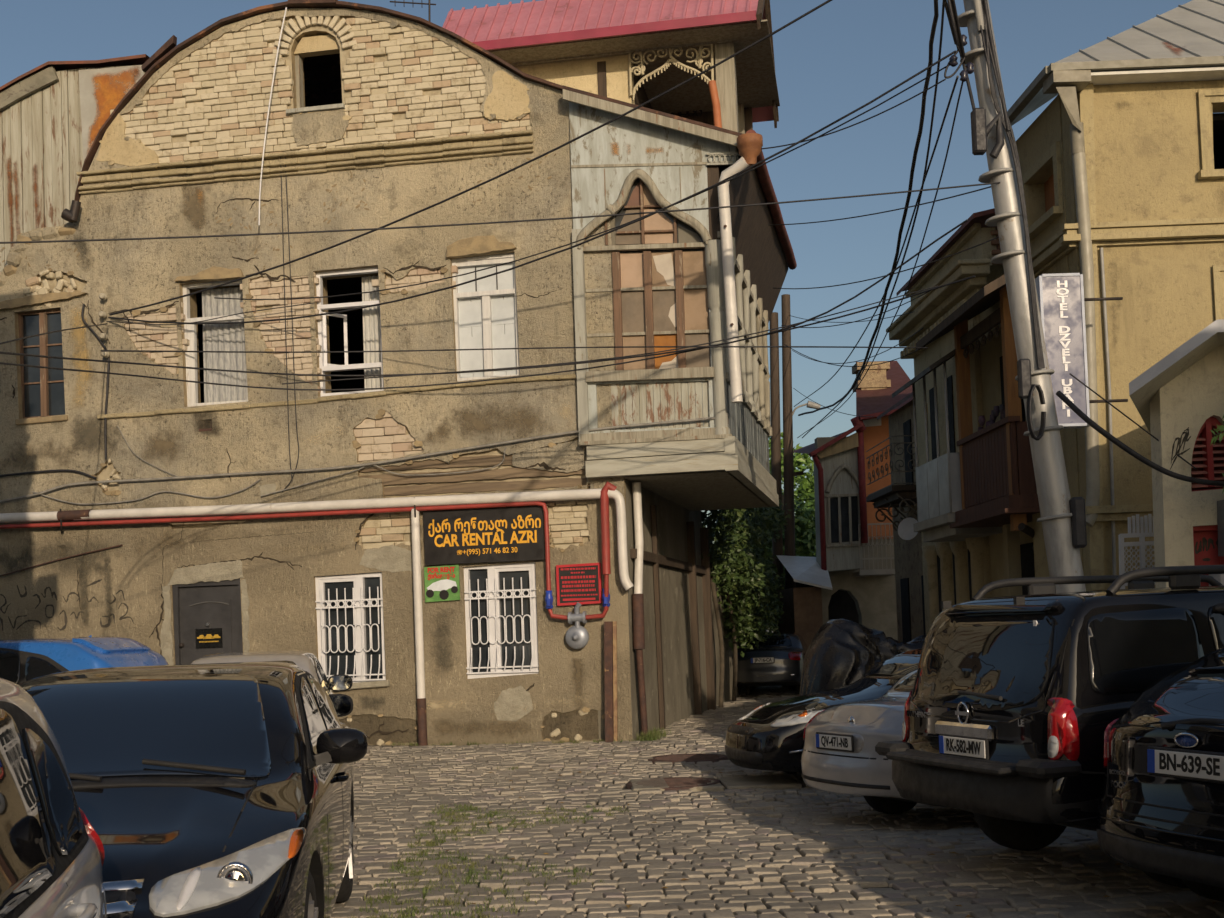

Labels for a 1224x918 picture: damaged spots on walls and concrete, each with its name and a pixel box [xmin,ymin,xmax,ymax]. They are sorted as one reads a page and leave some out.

rust [89,70,139,148]
spalling [96,10,532,166]
rust [7,158,19,247]
spalling [0,226,88,311]
spalling [174,200,325,393]
spalling [352,409,590,552]
crack [149,516,313,655]
spalling [540,707,605,742]